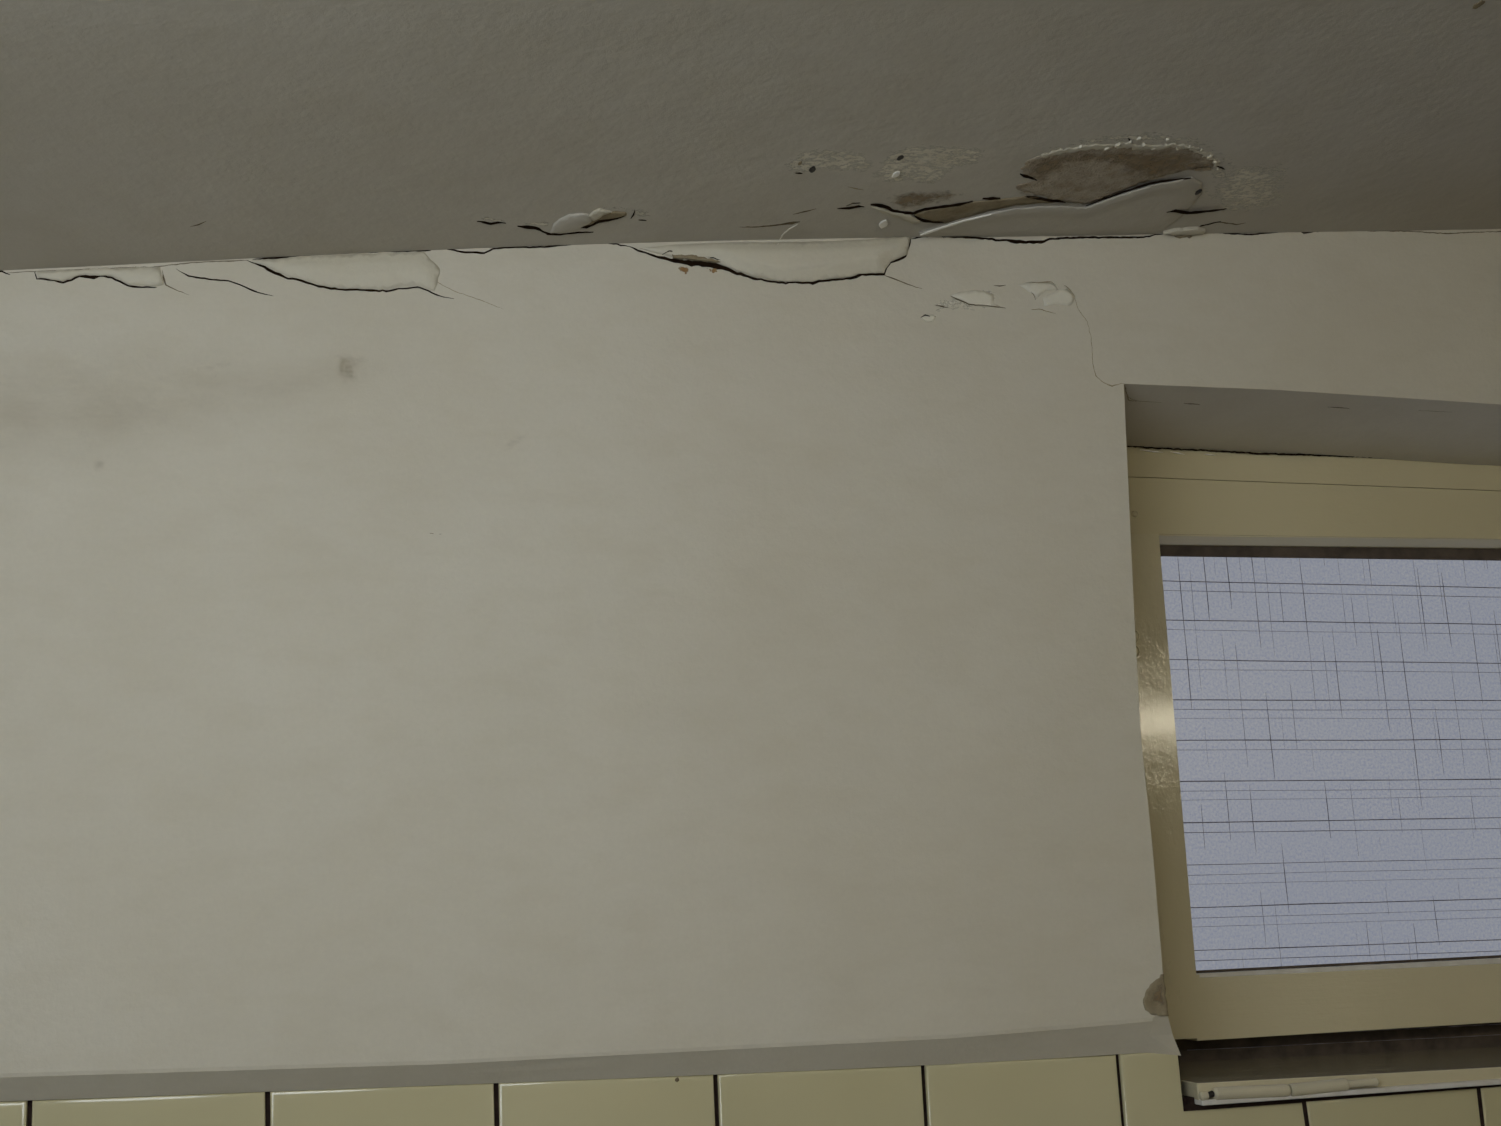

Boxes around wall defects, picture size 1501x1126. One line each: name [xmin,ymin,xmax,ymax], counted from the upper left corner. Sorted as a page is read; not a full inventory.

spalling [871,133,1225,229]
peeling [477,208,648,236]
crack [611,178,1312,289]
peeling [1163,221,1221,239]
crack [0,245,568,309]
peeling [922,281,1075,322]